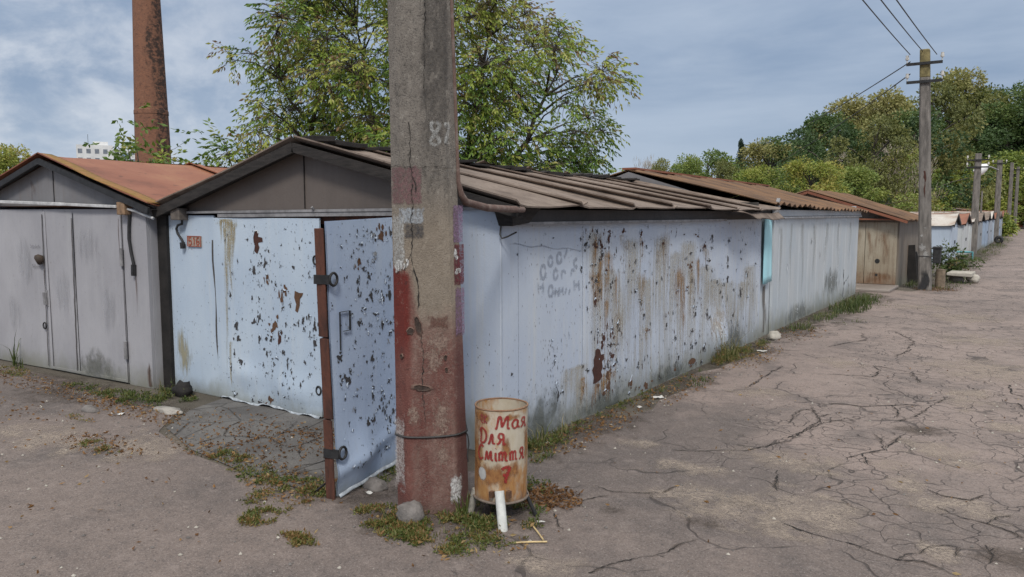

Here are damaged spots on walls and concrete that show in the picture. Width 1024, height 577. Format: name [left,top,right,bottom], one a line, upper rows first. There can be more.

crack [390,3,453,307]
peeling [222,224,318,404]
peeling [337,223,450,469]